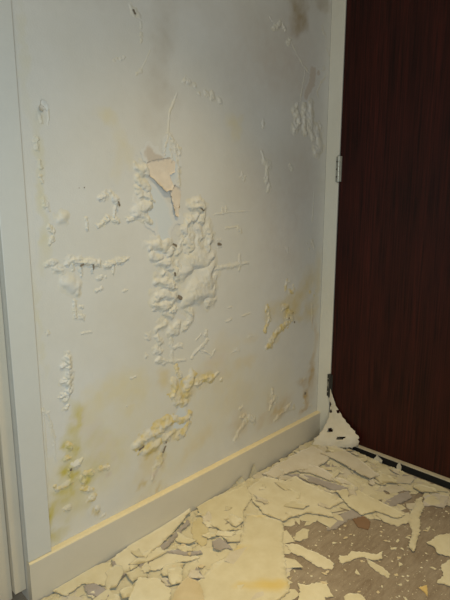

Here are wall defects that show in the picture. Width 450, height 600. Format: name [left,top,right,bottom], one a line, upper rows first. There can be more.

flaking render [140,131,184,240]
water stain [45,0,332,547]